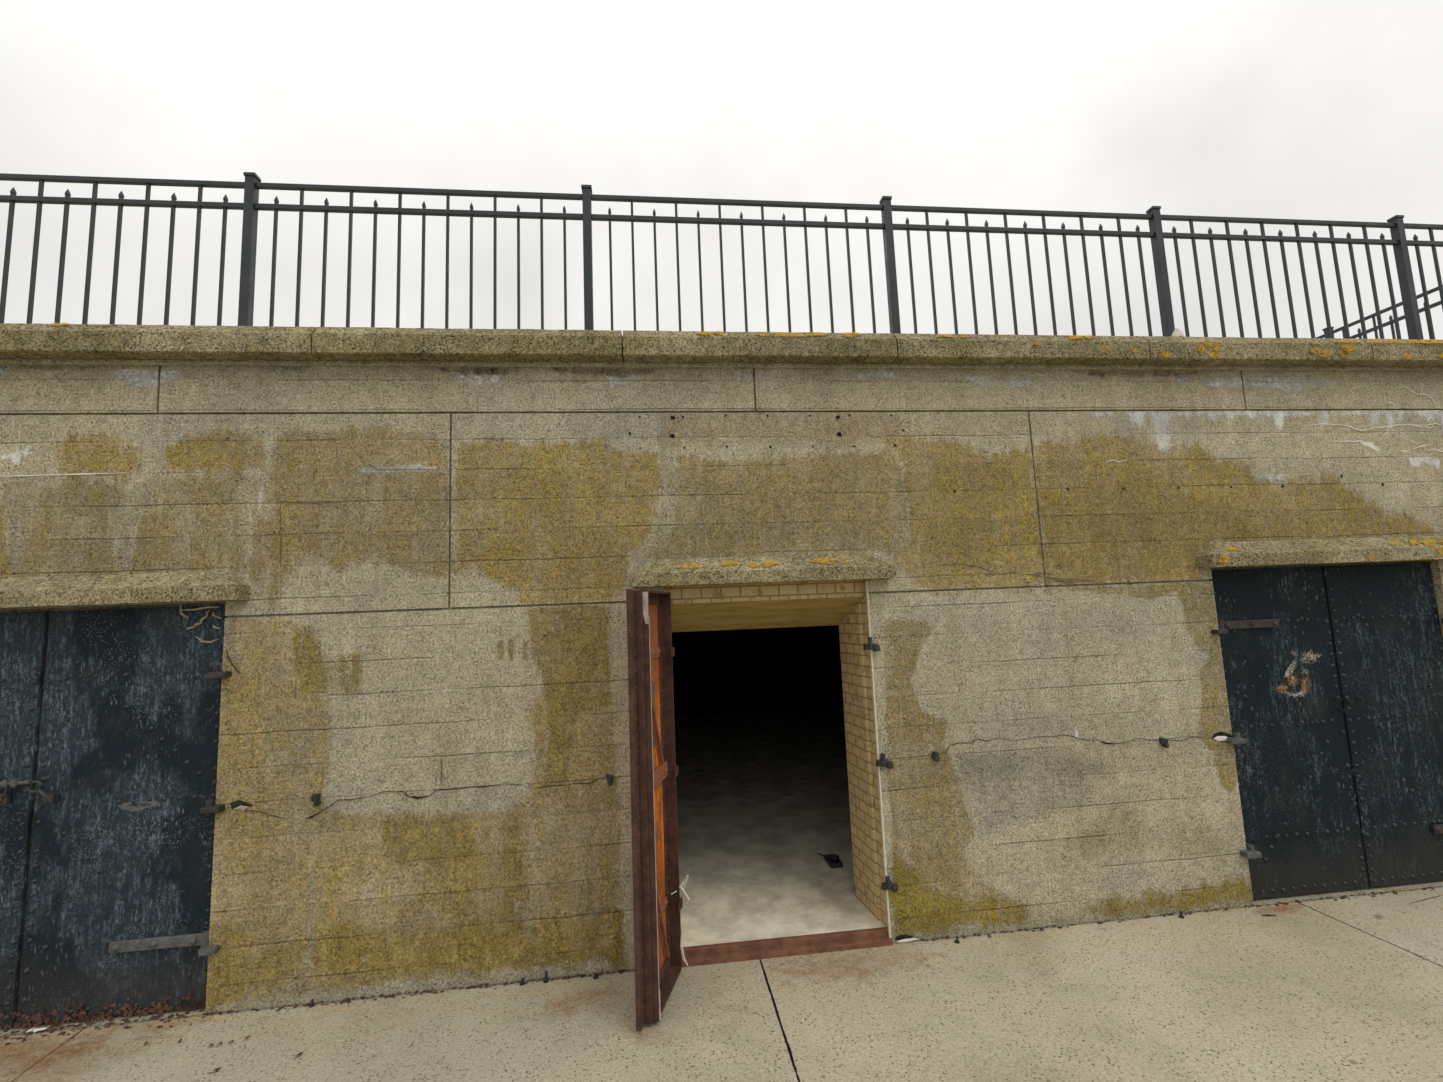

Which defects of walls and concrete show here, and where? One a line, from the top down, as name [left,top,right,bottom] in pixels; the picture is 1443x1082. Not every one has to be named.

damp [0,410,1443,1005]
crack [896,733,1230,760]
crack [228,756,600,819]